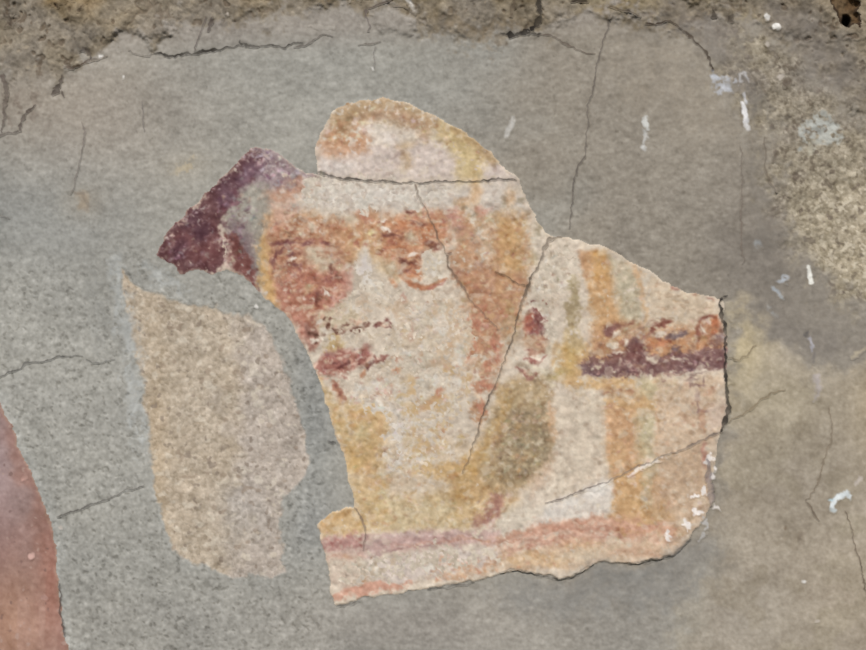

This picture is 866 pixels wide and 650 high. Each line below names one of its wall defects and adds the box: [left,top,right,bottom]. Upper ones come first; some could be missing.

spalling [711,9,738,25]
crack [0,73,36,137]
crack [316,0,715,474]
leakage [638,0,866,404]
spalling [751,35,866,292]
crack [0,354,115,378]
crack [545,294,786,504]
crack [805,407,833,521]
crack [844,510,866,592]